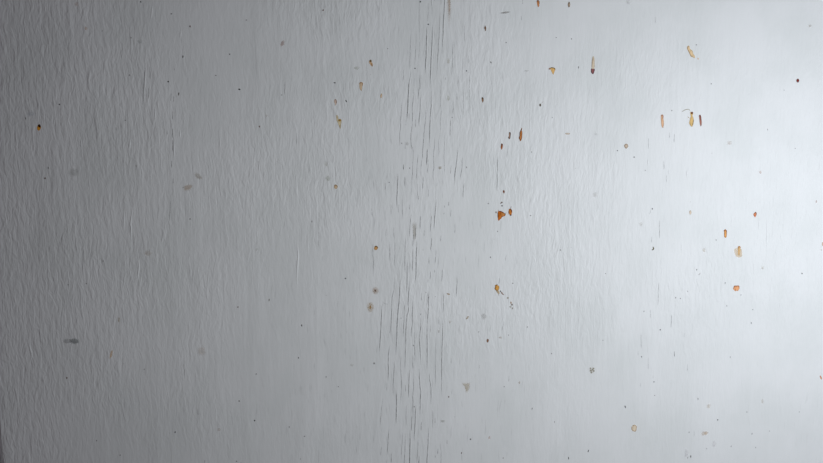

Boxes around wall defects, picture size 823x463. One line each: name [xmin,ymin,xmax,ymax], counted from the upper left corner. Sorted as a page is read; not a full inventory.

crack [400,0,451,171]
crack [380,167,457,463]